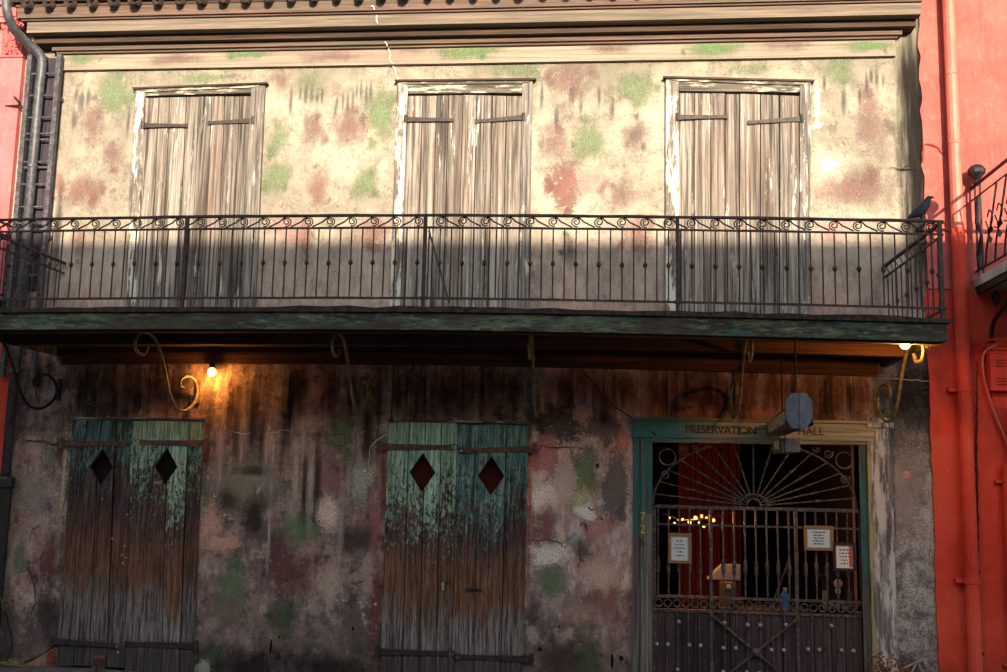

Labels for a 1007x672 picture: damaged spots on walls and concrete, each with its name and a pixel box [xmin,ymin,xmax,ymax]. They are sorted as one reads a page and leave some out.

damp [73,92,101,140]
damp [811,79,825,130]
damp [56,175,105,204]
damp [310,175,330,203]
damp [544,112,581,220]
damp [815,158,881,202]
damp [282,218,313,254]
damp [619,219,653,250]
damp [206,378,303,559]
damp [293,425,320,507]